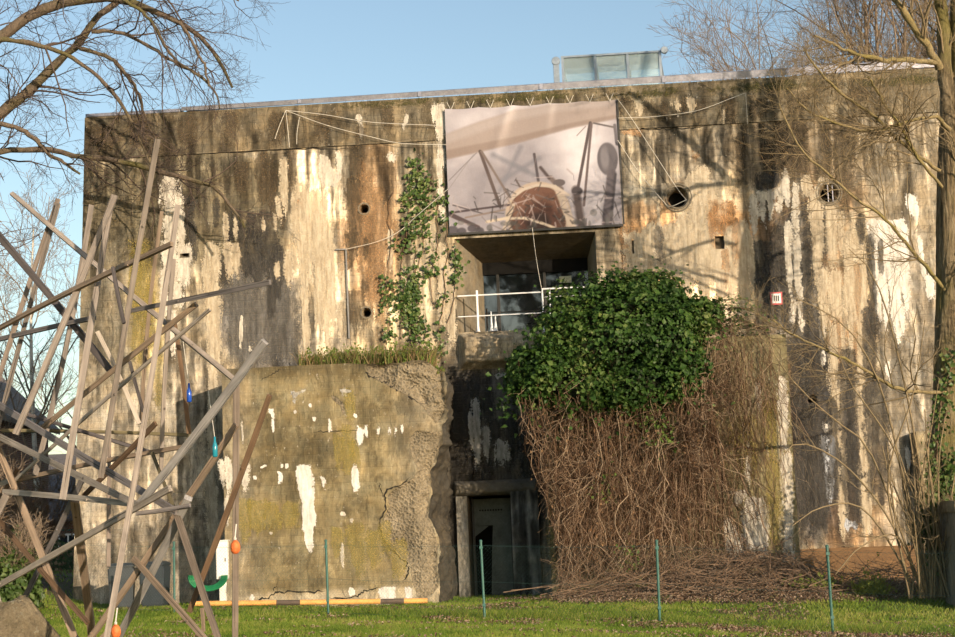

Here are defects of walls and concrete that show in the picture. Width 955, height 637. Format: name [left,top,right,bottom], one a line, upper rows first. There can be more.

leakage [459,88,597,104]
leakage [158,97,458,598]
leakage [615,73,937,549]
leakage [450,369,538,481]
peeling [217,455,267,524]
peeling [277,464,326,552]
spalling [332,362,446,605]
crack [378,477,425,583]
crack [259,587,378,600]